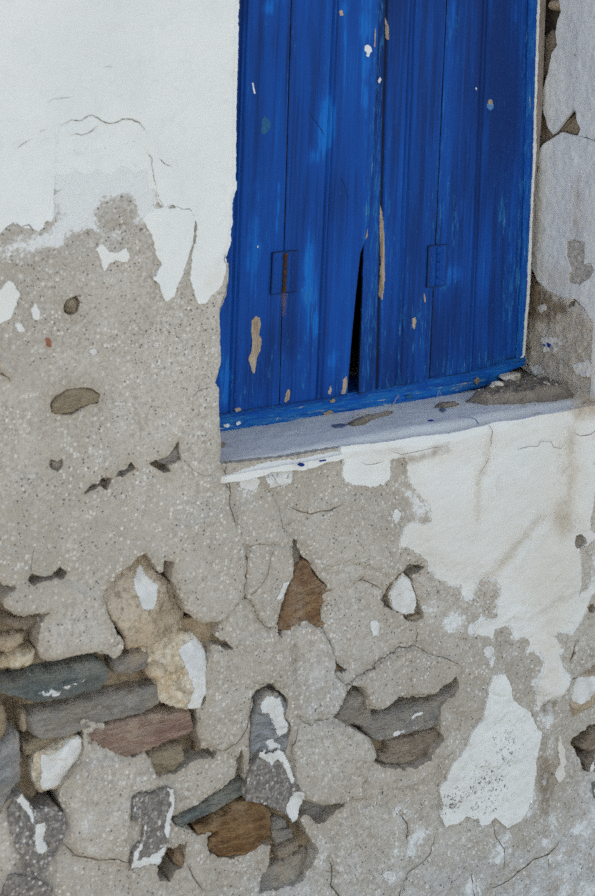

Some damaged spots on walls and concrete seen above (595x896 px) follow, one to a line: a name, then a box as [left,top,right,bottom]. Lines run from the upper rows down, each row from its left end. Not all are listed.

spalling [543,0,561,88]
spalling [539,104,580,147]
peeling [567,238,594,285]
spalling [511,285,595,420]
peeling [0,164,458,896]
crack [274,499,341,529]
crack [244,544,273,630]
crack [321,627,457,685]
peeling [228,457,595,896]
crack [471,822,559,896]